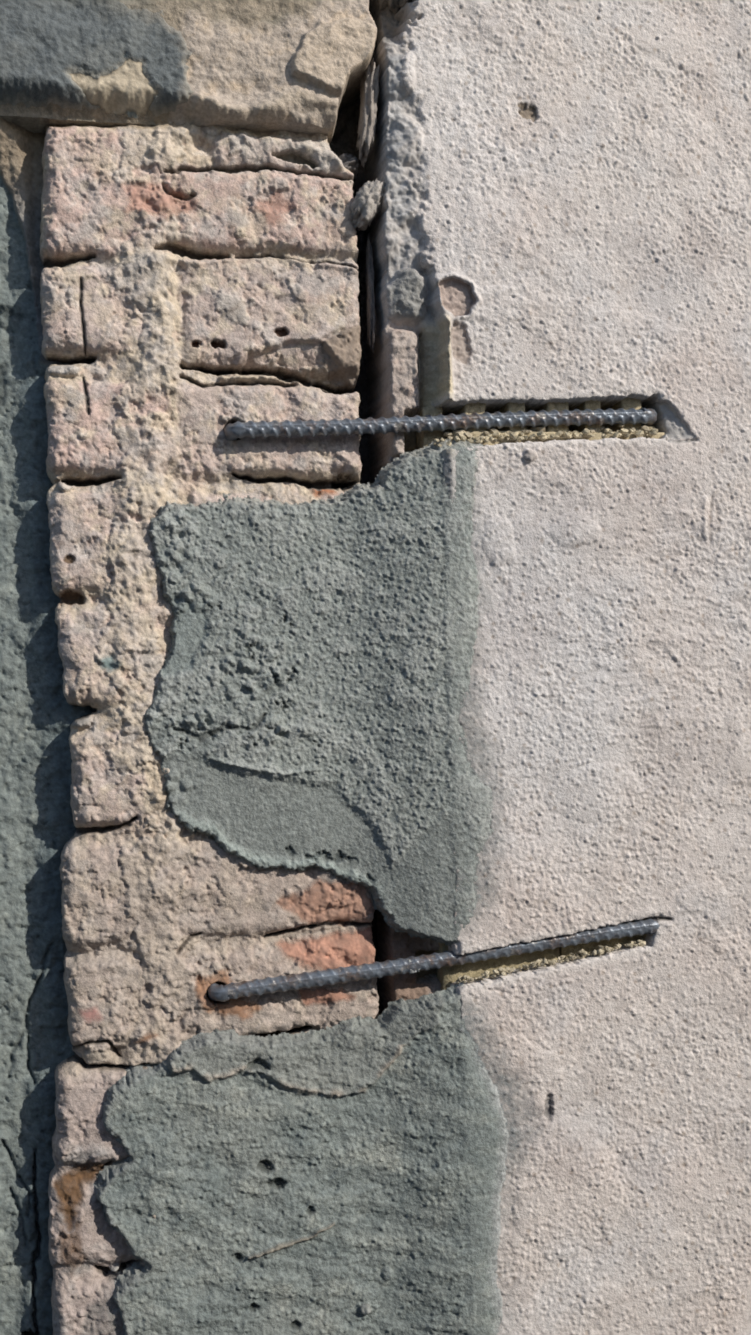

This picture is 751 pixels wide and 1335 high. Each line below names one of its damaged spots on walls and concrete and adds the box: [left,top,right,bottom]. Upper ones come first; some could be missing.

spalling [274,153,317,169]
spalling [357,36,425,295]
spalling [130,184,193,213]
spalling [438,278,476,363]
spalling [192,341,225,349]
spalling [321,325,362,394]
spalling [60,591,84,605]
spalling [286,847,348,862]
spalling [247,1058,269,1070]
spalling [258,1160,283,1187]
crack [23,1153,41,1335]